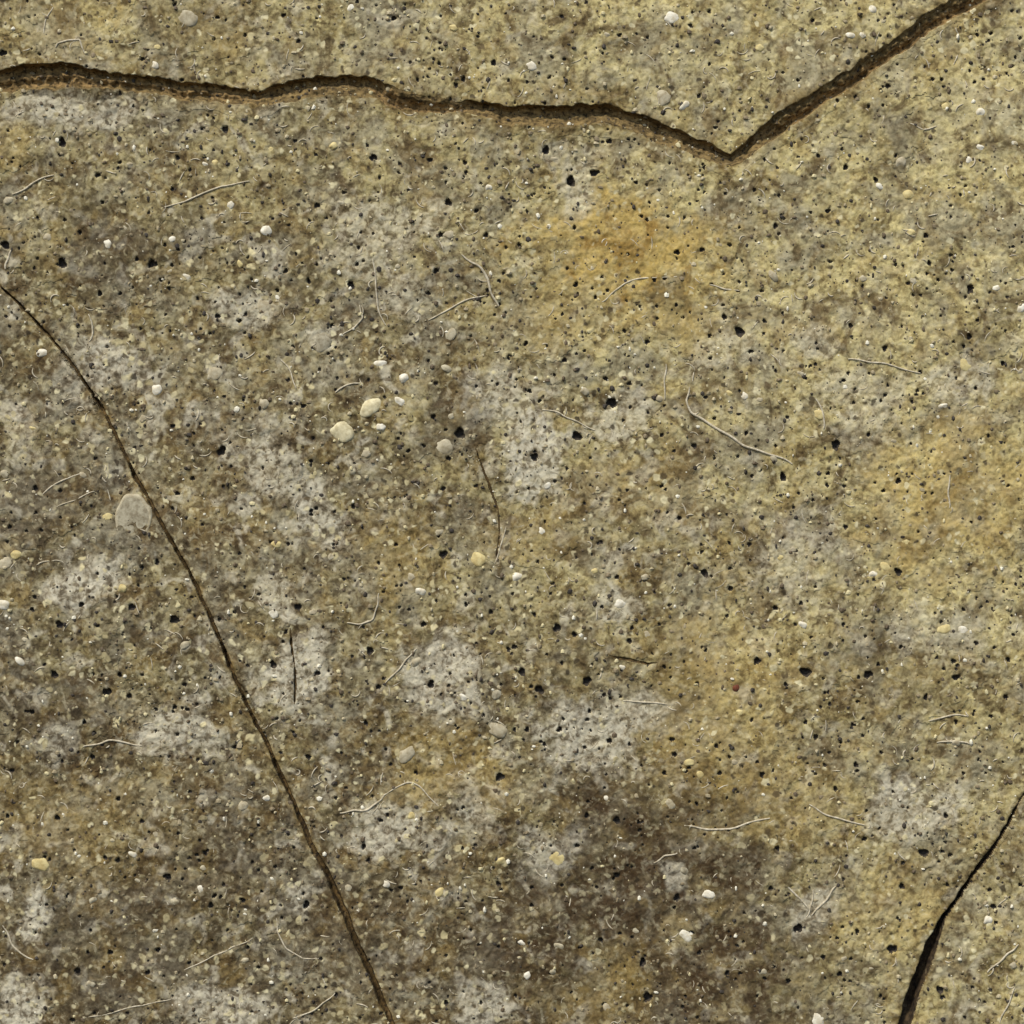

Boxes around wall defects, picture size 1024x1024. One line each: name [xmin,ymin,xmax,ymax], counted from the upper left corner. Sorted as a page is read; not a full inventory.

crack [0,0,1004,177]
crack [0,276,399,1024]
crack [892,788,1024,1024]